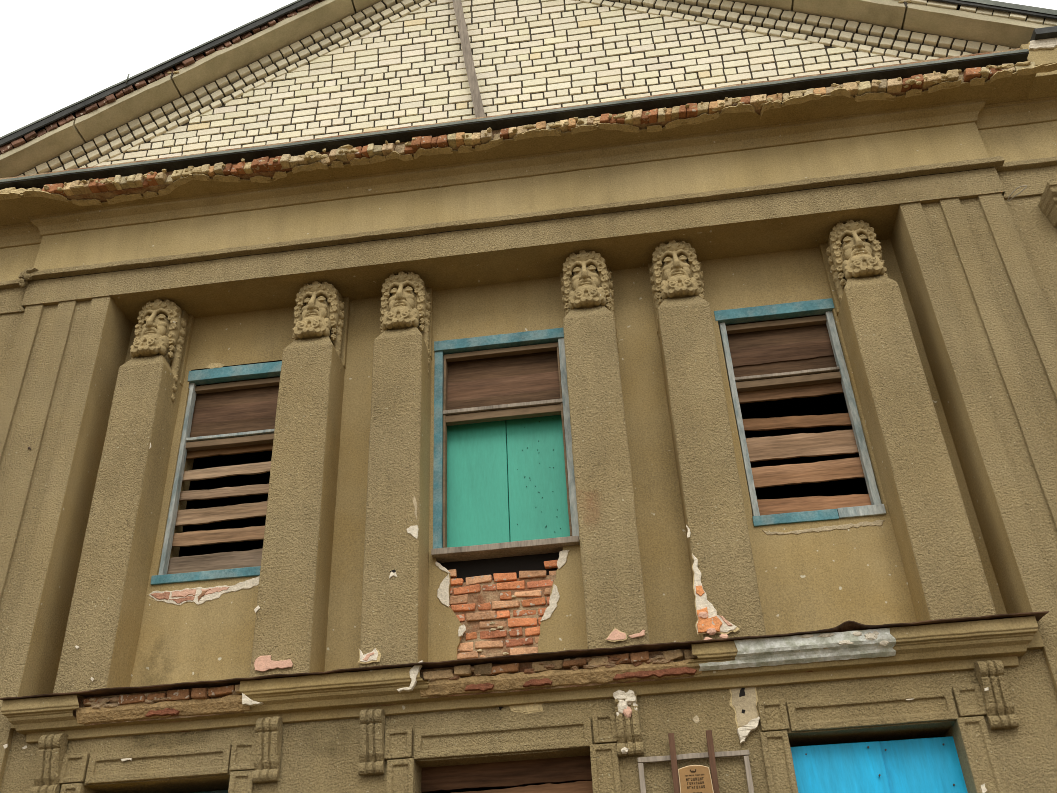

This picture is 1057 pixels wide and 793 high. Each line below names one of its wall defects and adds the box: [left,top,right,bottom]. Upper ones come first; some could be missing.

spalling [0,38,1057,206]
flaking render [146,575,260,606]
flaking render [397,550,896,718]
flaking render [254,655,293,672]
flaking render [357,648,381,664]
flaking render [76,684,264,725]
flaking render [729,687,760,744]